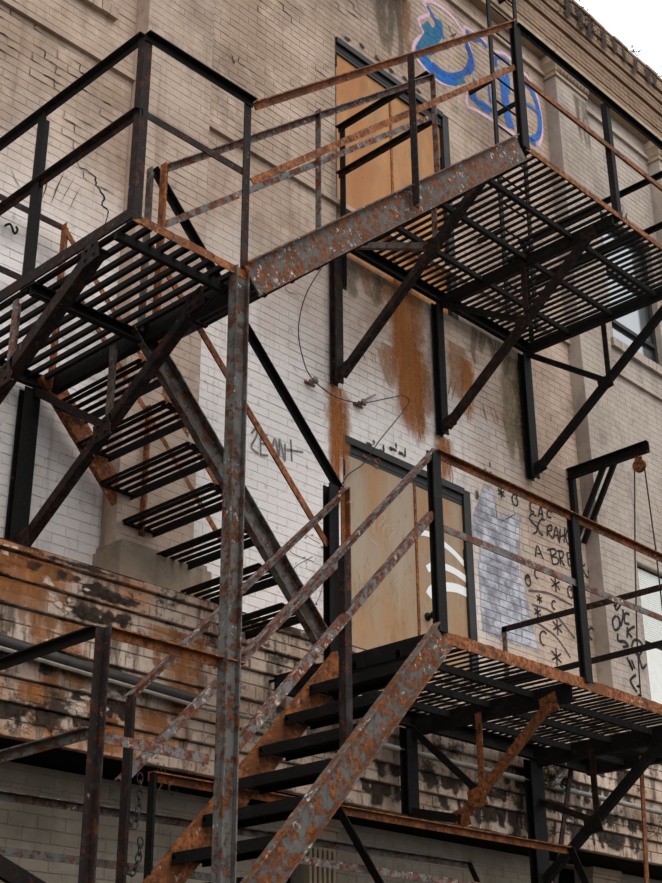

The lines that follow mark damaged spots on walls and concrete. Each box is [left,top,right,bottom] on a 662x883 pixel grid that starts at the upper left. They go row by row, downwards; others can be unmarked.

crack [0,0,114,223]
rust [395,290,425,440]
rust [331,385,343,475]
peeling [43,574,72,612]
water stain [361,762,401,805]
water stain [421,766,528,832]
water stain [544,776,609,839]
water stain [593,815,642,853]